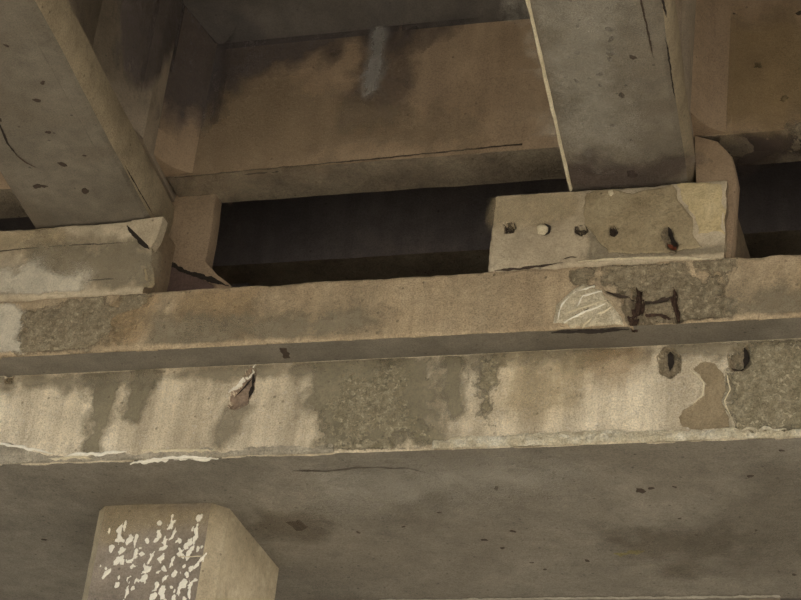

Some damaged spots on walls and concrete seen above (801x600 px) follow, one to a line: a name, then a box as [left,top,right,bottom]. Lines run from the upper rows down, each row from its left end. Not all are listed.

water stain [340,26,410,126]
crack [640,0,675,96]
crack [0,125,34,167]
crack [57,225,149,249]
crack [171,262,229,286]
spalling [553,226,735,333]
spalling [0,358,433,465]
spalling [656,340,801,433]